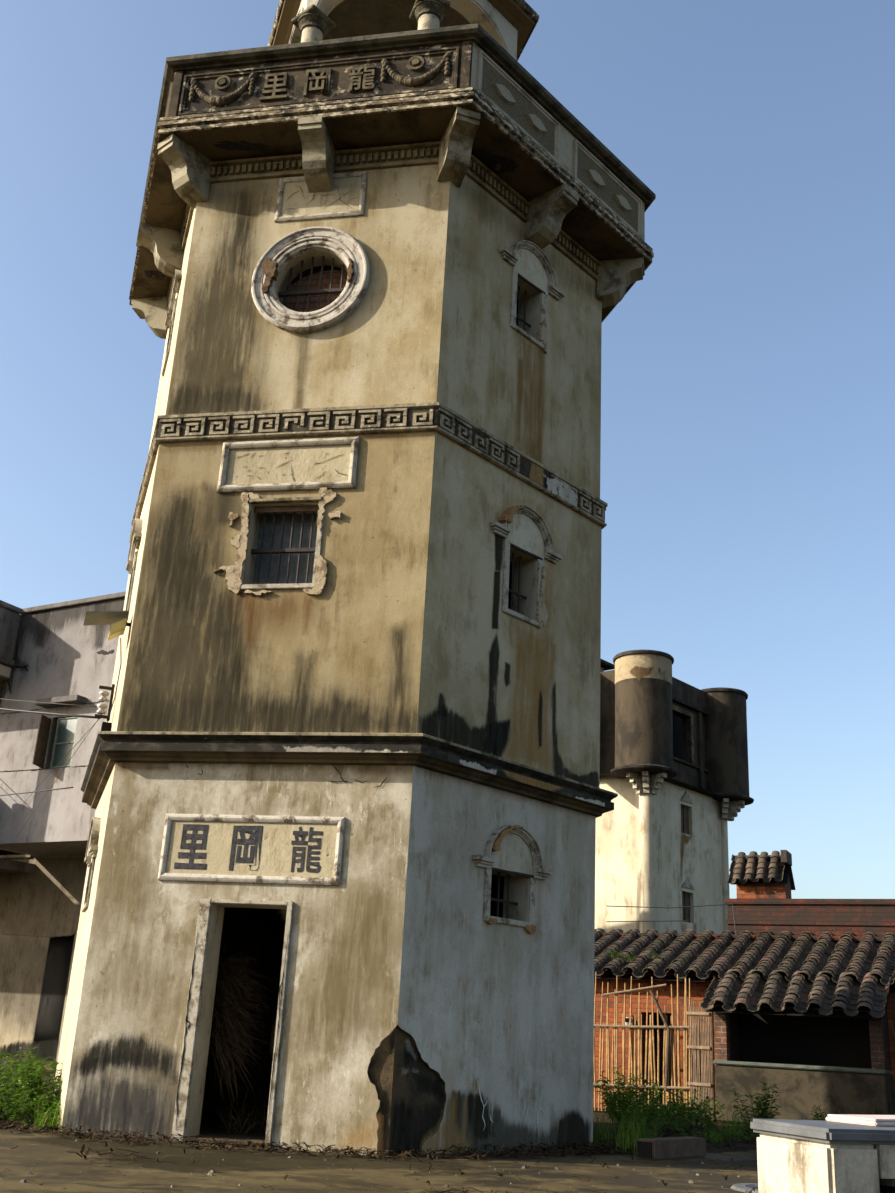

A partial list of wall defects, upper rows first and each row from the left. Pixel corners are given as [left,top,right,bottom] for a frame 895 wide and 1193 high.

leakage [173,196,259,414]
flaking render [214,492,272,596]
flaking render [303,555,328,596]
flaking render [316,487,343,532]
leakage [121,497,510,775]
leakage [538,685,599,787]
leakage [82,1053,167,1073]
leakage [26,1078,589,1171]
spalling [367,1025,446,1156]